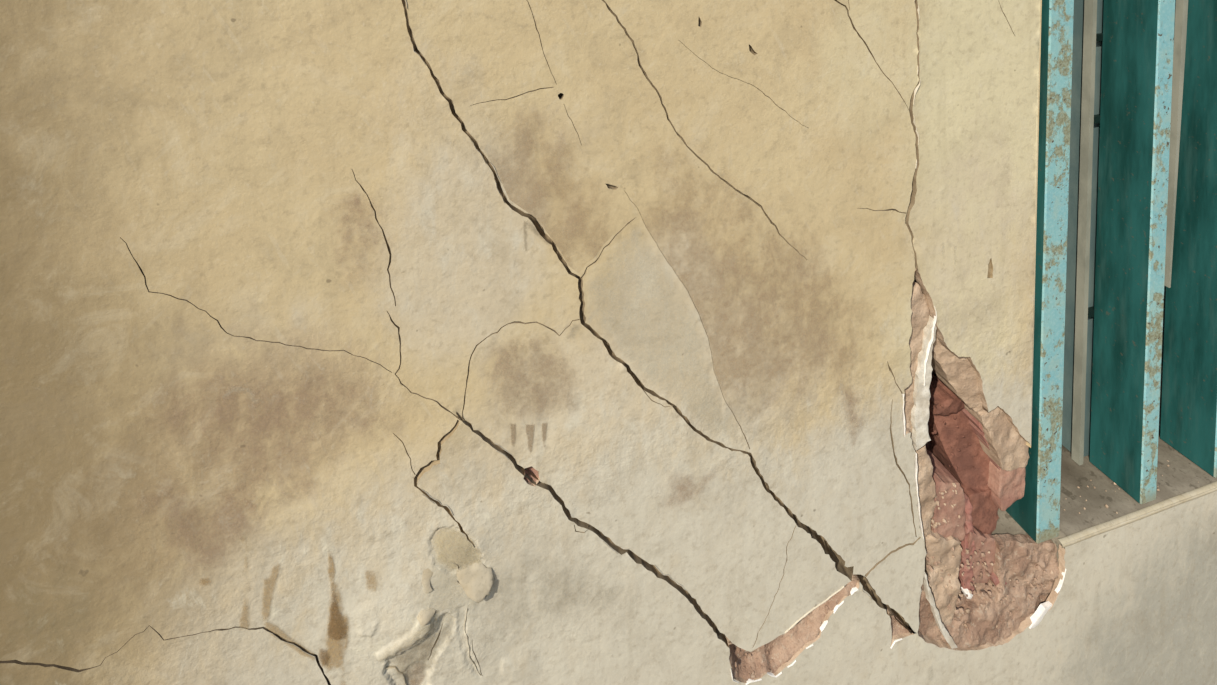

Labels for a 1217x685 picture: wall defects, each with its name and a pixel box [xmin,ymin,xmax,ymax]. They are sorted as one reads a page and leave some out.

crack [120,0,921,648]
spalling [885,268,1066,651]
crack [0,625,331,685]
flaking render [435,532,494,676]
flaking render [725,574,860,685]